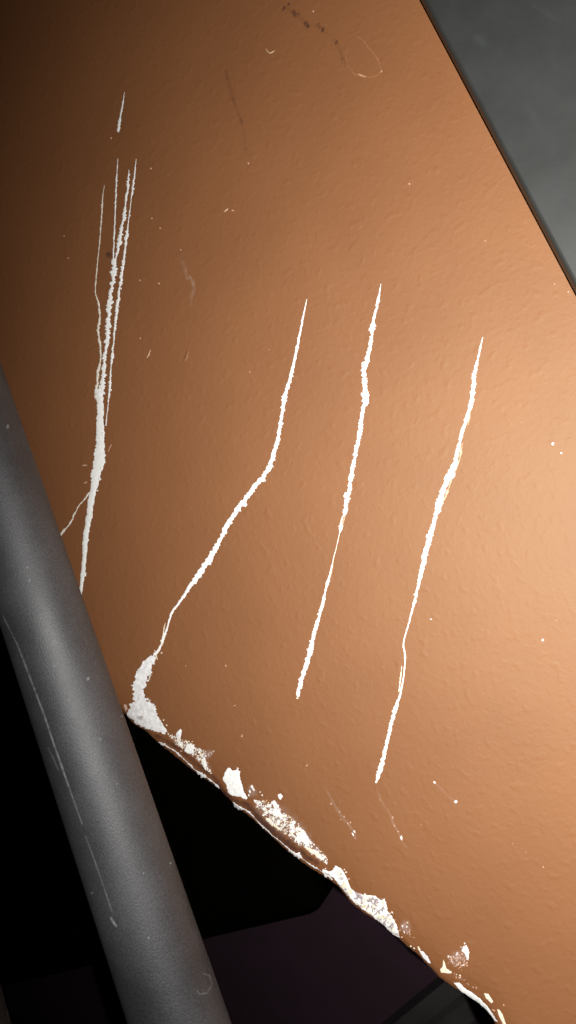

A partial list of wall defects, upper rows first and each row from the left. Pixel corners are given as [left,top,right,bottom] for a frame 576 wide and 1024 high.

spalling [124,654,506,1024]